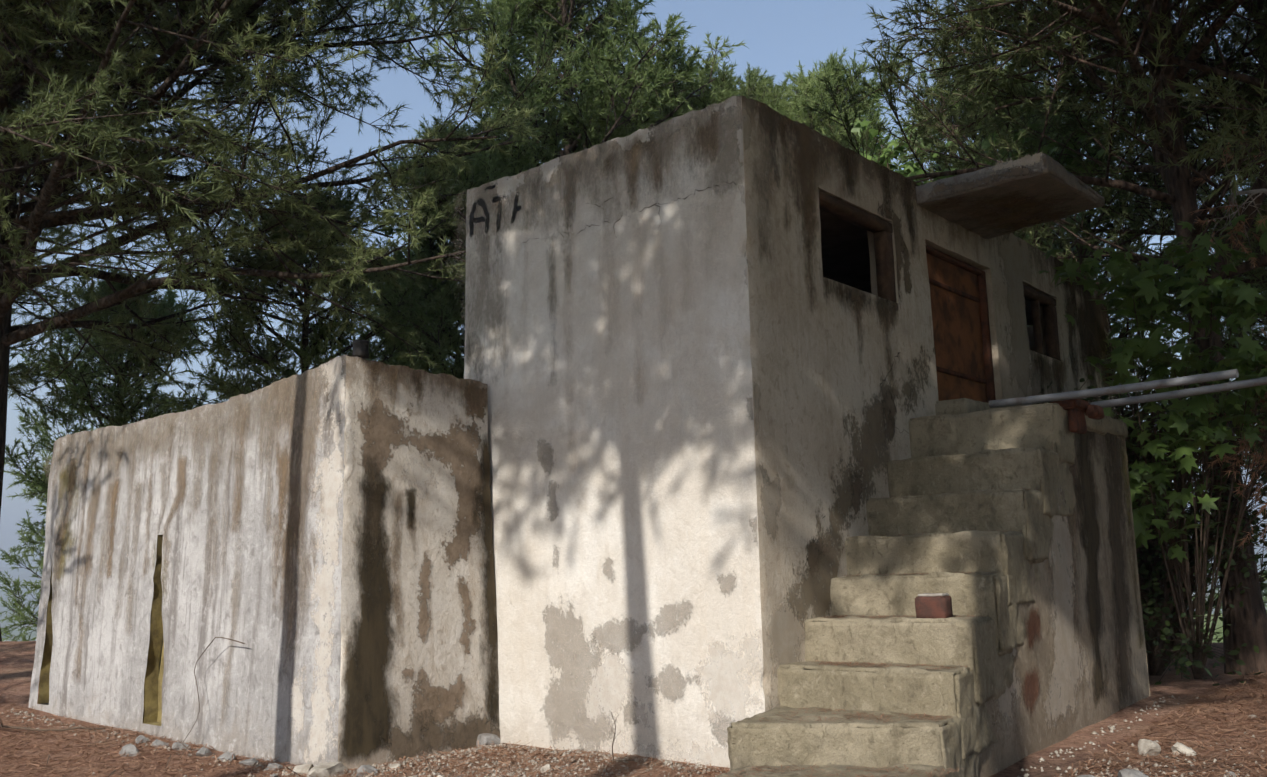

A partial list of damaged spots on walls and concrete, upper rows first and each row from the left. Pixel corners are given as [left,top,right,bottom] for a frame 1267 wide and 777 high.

crack [524,182,737,243]
damp [1033,257,1117,419]
damp [55,444,123,588]
damp [169,458,186,521]
damp [268,378,317,662]
peeling [289,357,500,764]
damp [1062,431,1143,705]
peeling [553,652,730,768]